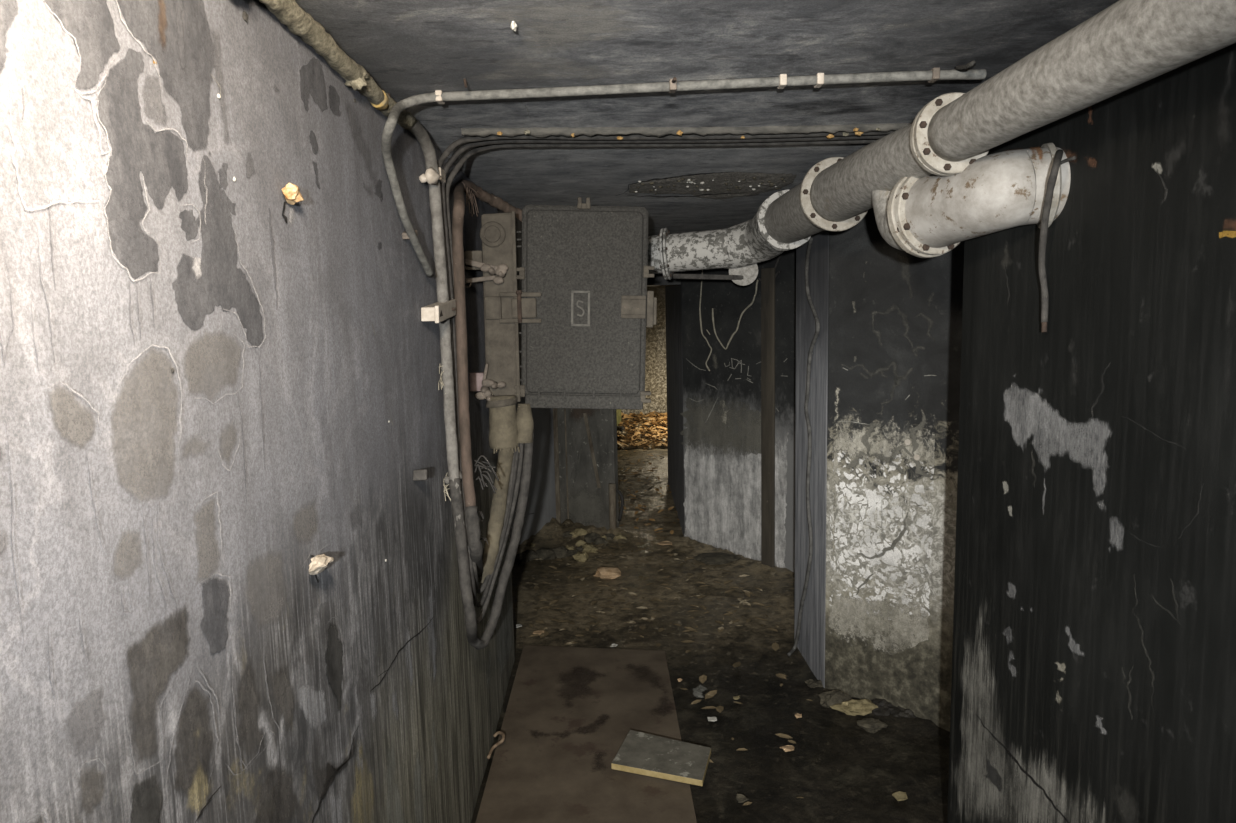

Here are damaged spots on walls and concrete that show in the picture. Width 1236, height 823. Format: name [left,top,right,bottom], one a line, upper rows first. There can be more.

leakage [0,0,17,72]
leakage [300,58,383,201]
corrosion [1219,220,1236,238]
leakage [9,0,345,823]
peeling [1004,362,1124,550]
crack [371,618,433,691]
crack [312,726,359,823]
leakage [313,739,371,823]